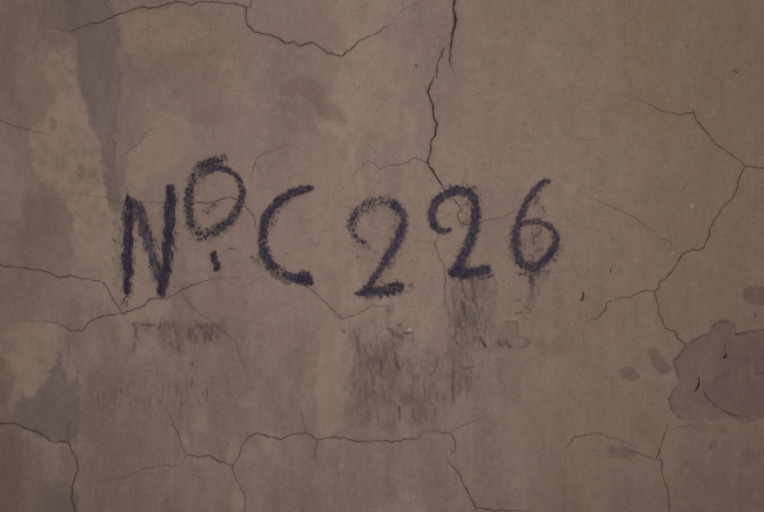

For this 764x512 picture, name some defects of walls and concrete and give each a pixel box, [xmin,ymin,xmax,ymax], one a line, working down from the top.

crack [94,0,368,57]
crack [440,0,457,61]
crack [420,84,441,184]
crack [639,108,764,344]
crack [0,423,77,510]